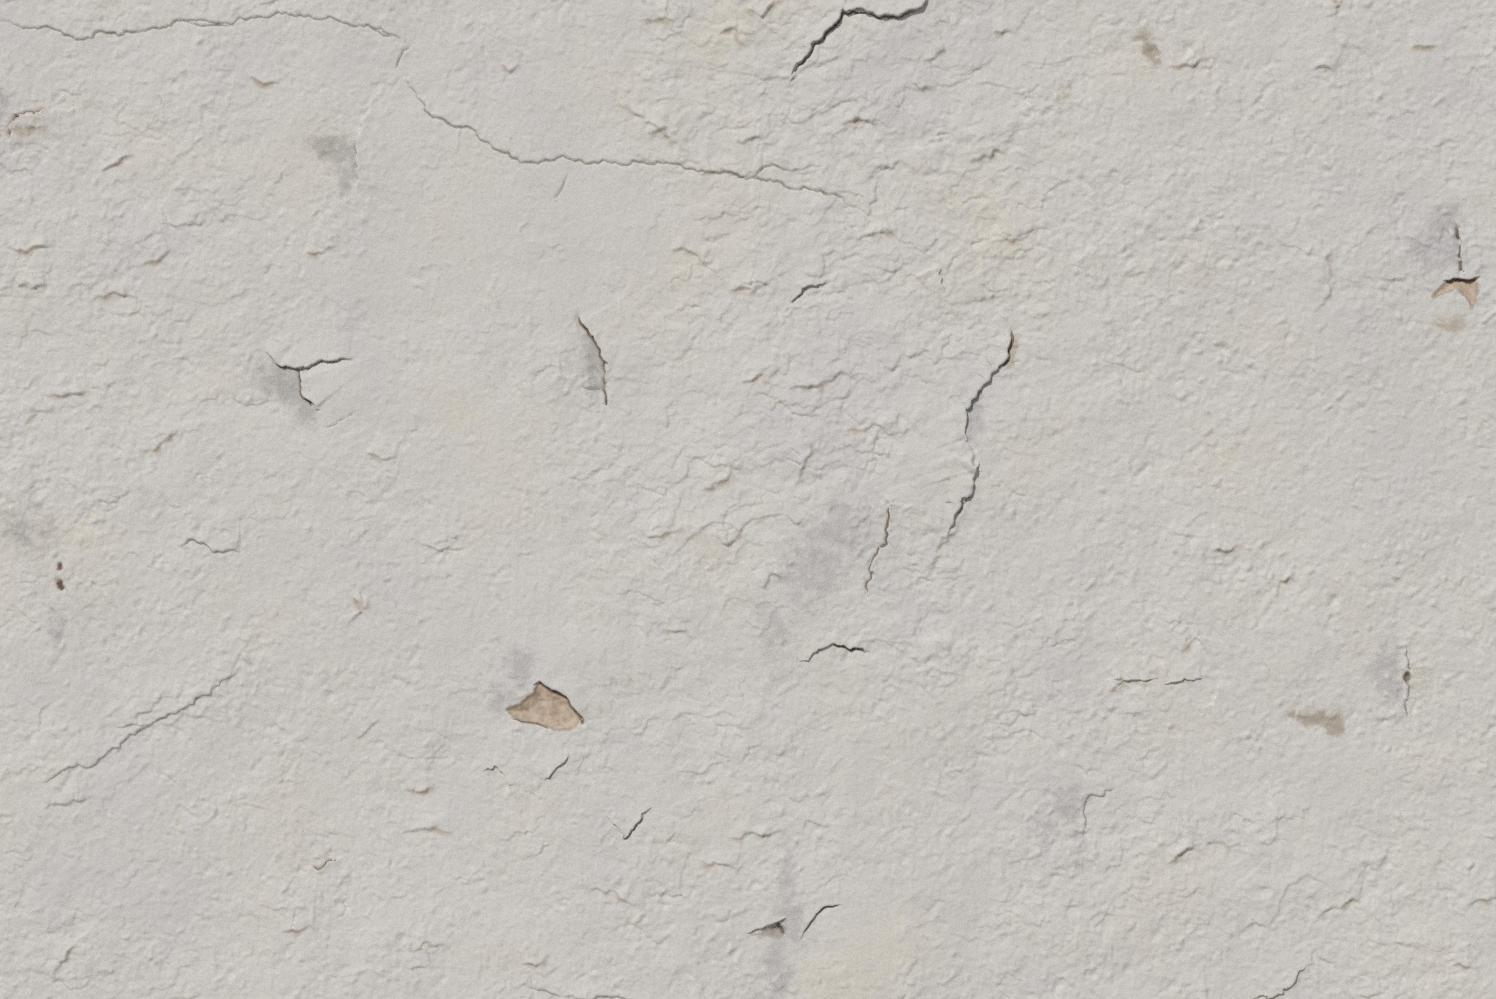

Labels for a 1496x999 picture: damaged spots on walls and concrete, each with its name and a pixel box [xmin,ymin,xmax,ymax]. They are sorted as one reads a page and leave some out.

peeling [786,0,926,85]
spalling [1433,228,1480,308]
peeling [263,344,351,410]
spalling [507,674,586,730]